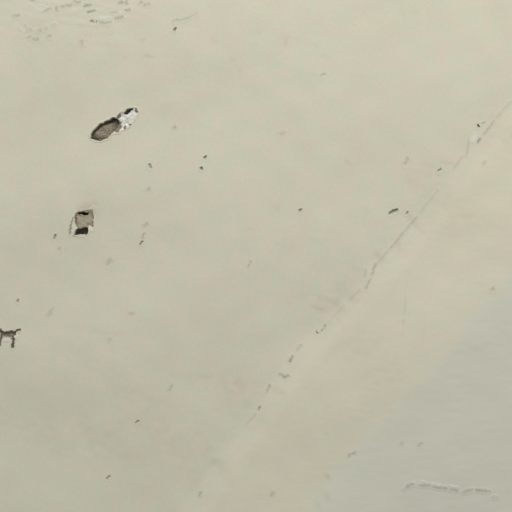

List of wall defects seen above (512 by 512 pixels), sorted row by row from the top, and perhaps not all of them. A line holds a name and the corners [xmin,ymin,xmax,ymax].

spalling [88,105,140,143]
spalling [66,195,103,240]